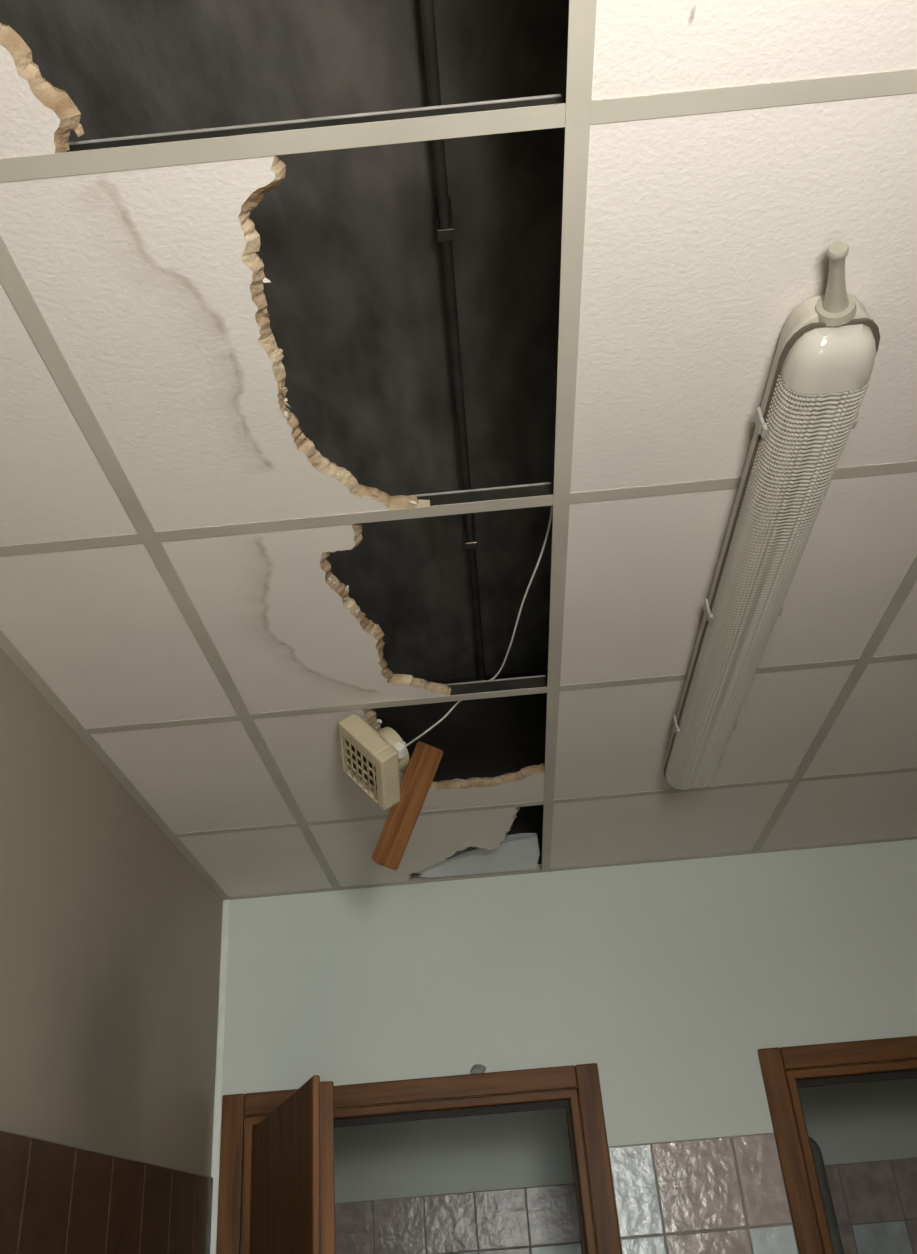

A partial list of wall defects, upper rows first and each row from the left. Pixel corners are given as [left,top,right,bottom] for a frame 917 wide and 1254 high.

spalling [0,22,85,153]
spalling [238,155,430,510]
spalling [320,523,451,696]
spalling [362,709,383,732]
spalling [429,763,545,790]